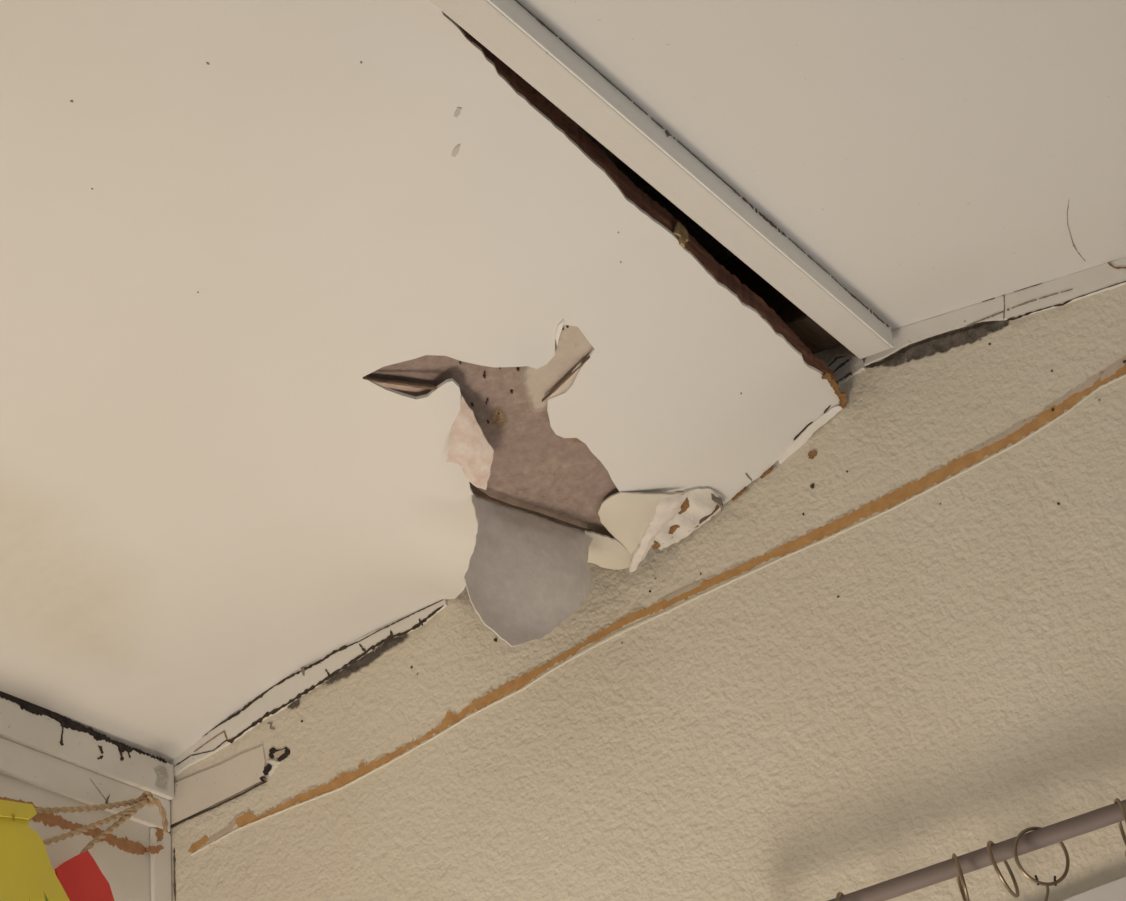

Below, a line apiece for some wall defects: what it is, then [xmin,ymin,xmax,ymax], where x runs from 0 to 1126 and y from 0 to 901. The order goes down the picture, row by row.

crack [515,0,889,327]
crack [828,356,852,383]
crack [174,599,444,767]
peeling [188,319,1126,855]